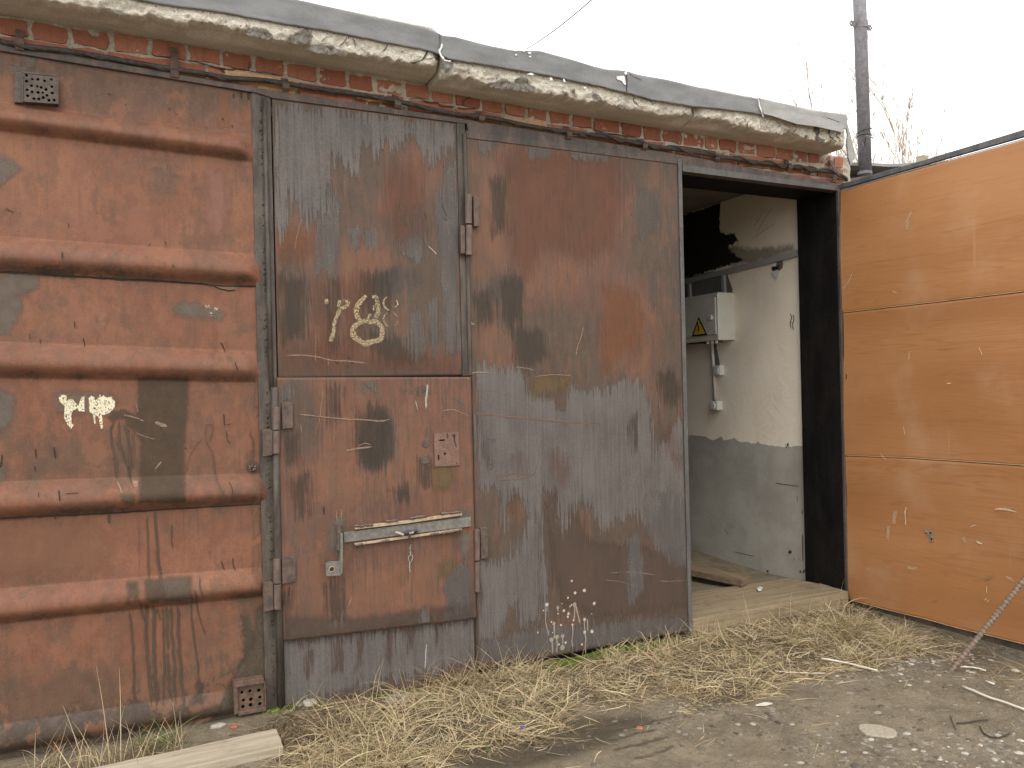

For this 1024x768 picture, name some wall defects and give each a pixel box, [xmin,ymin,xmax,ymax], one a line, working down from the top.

spalling [244,27,272,40]
spalling [287,28,348,57]
spalling [225,70,281,80]
spalling [438,44,454,76]
spalling [490,73,535,92]
peeling [273,93,461,368]
flaking render [771,261,783,279]
peeling [284,358,687,705]
rust [545,489,686,620]
water stain [127,510,219,724]